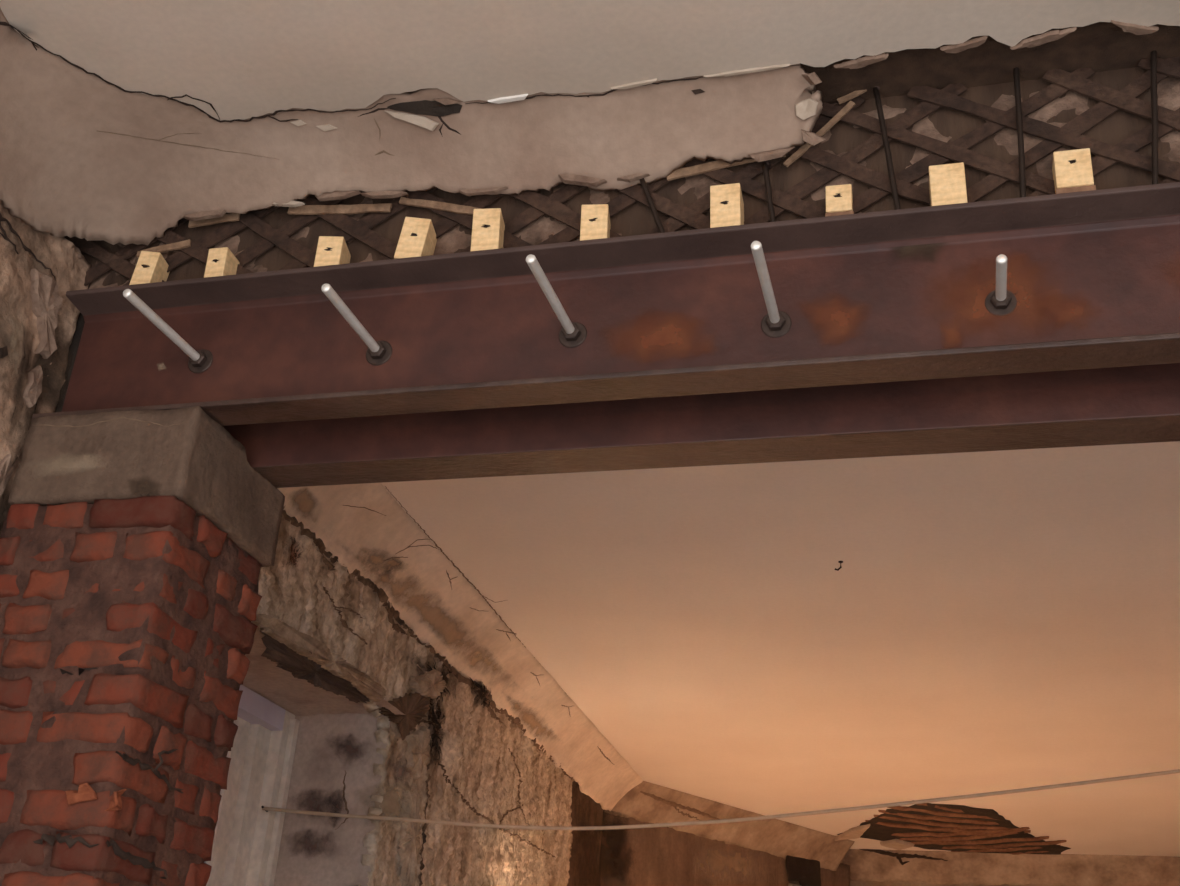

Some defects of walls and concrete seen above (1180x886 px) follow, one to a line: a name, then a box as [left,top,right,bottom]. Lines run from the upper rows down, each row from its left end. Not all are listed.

flaking render [1010,27,1077,50]
crack [17,30,396,160]
flaking render [358,98,462,141]
flaking render [488,94,528,104]
crack [525,76,704,99]
flaking render [748,72,826,162]
leakage [369,554,497,706]
crack [344,486,572,717]
leakage [416,661,458,762]
leakage [513,703,552,736]
crack [417,645,572,886]
flaking render [835,800,1071,855]